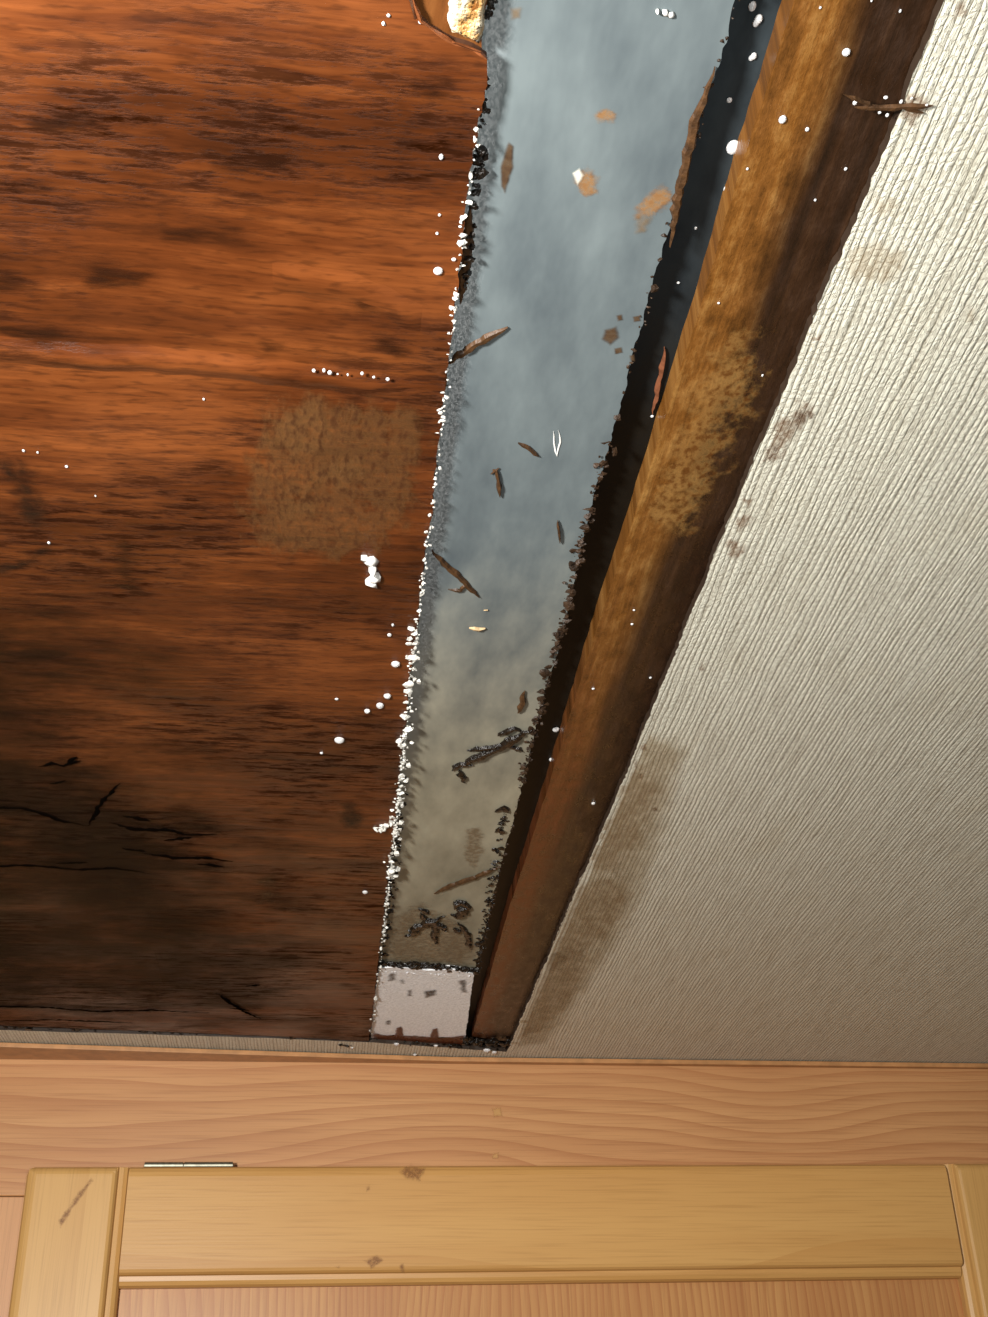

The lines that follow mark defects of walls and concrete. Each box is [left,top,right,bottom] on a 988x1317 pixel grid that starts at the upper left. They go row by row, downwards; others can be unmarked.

peeling [655,336,753,529]
spalling [468,441,617,977]